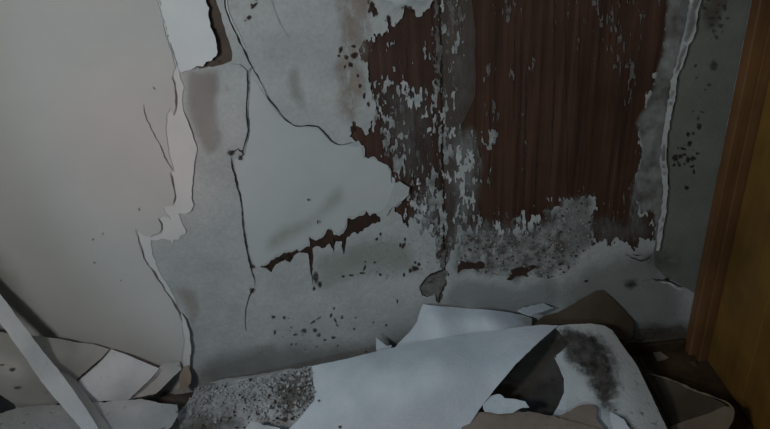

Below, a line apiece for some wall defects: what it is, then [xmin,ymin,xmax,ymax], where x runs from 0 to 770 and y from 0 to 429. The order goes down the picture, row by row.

peeling [220,64,248,153]
crack [224,0,352,328]
spalling [261,0,702,303]
damp [672,110,703,174]